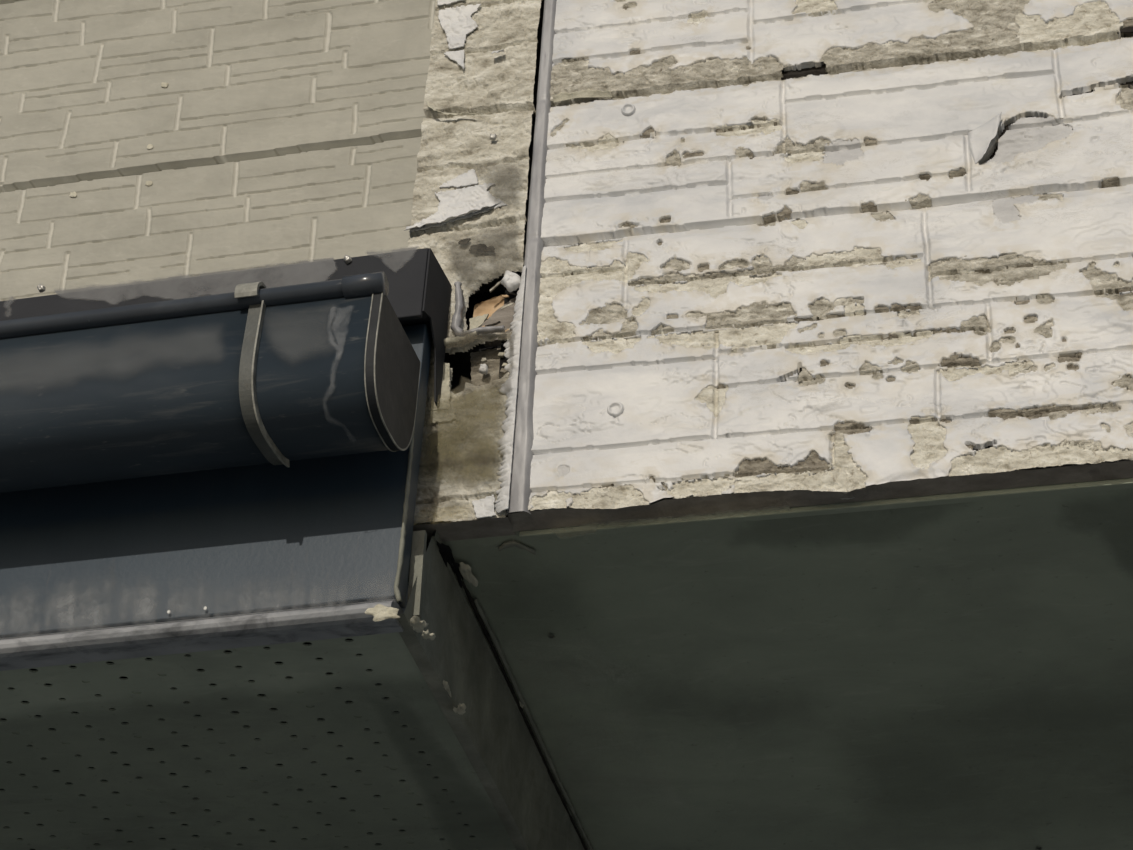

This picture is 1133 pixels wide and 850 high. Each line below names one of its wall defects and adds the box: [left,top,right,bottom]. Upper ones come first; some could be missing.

peeling [437,0,481,70]
peeling [550,0,1133,137]
peeling [715,118,877,166]
peeling [949,112,1073,179]
peeling [404,169,507,234]
peeling [757,181,828,229]
peeling [537,223,1082,389]
spalling [427,270,521,424]
peeling [730,422,872,494]
peeling [907,402,1133,477]
peeling [472,494,496,519]
peeling [529,484,650,511]